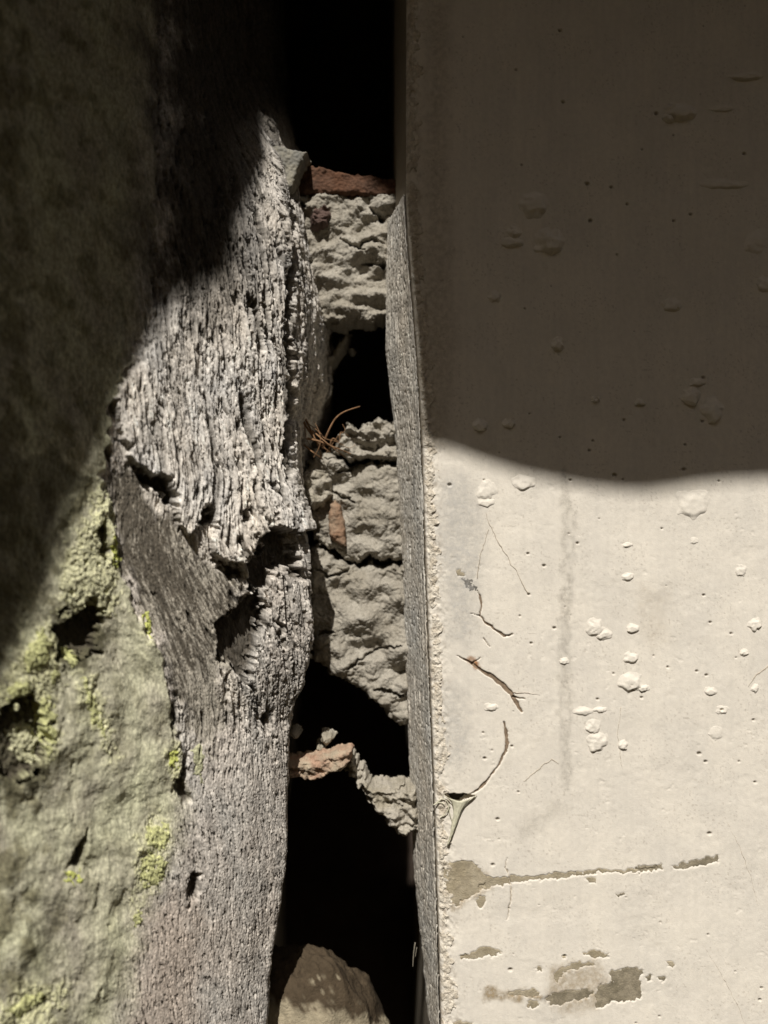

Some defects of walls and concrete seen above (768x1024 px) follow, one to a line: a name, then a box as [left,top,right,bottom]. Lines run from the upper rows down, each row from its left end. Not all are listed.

crack [459,514,538,794]
spalling [406,0,719,1024]